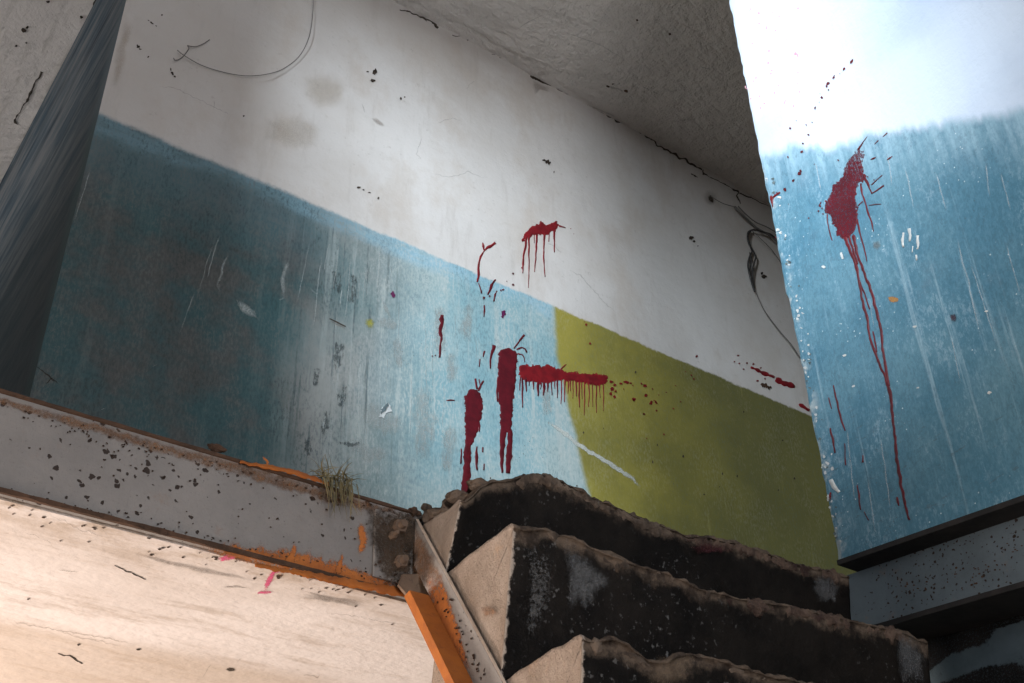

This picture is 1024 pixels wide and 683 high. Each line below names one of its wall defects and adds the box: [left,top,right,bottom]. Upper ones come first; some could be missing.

crack [14,71,43,125]
crack [732,188,770,207]
corrosion [0,399,395,514]
corrosion [358,525,367,551]
spalling [516,473,841,600]
corrosion [211,545,405,596]
peeling [528,549,554,633]
spalling [590,637,651,668]